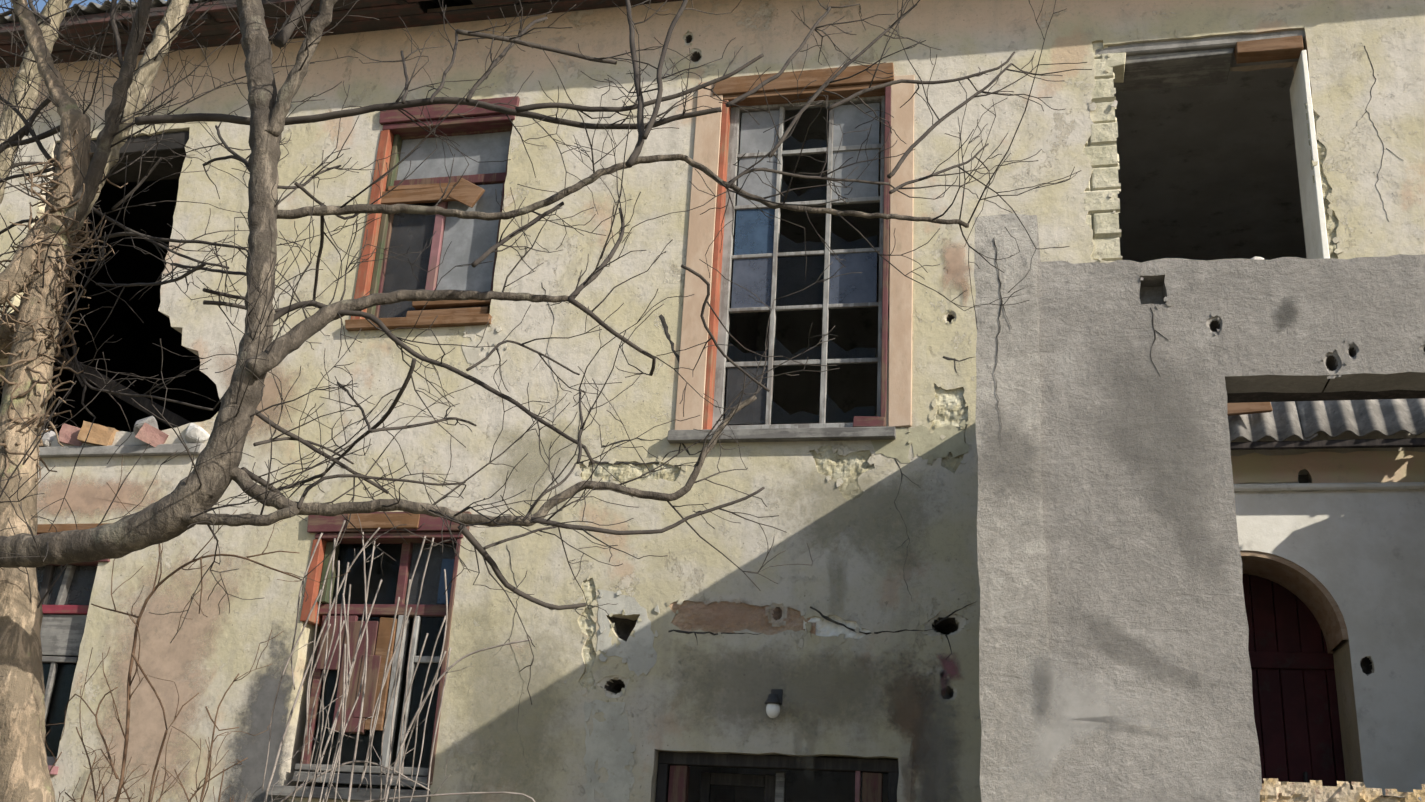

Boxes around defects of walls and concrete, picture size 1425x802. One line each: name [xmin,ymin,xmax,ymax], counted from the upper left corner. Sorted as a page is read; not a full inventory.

crack [1358,46,1404,219]
peeling [807,383,970,500]
water stain [224,637,294,802]
peeling [577,576,684,702]
spalling [801,610,874,645]
crack [810,458,977,659]